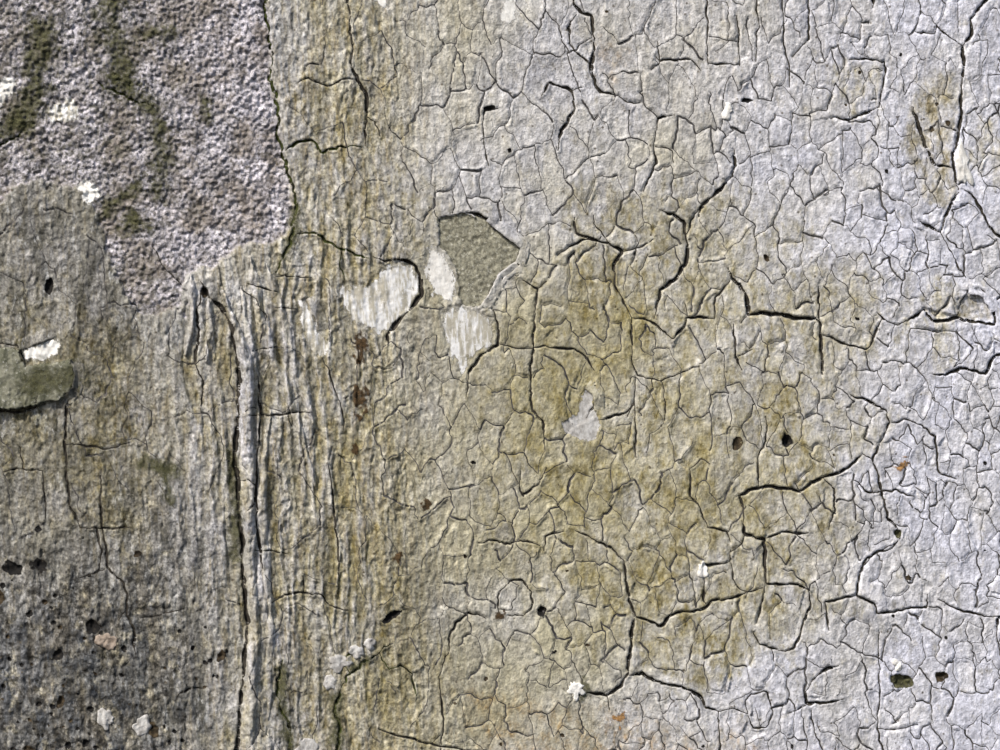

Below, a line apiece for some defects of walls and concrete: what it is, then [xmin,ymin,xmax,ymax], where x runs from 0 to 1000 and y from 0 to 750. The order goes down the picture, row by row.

peeling [0,77,16,107]
peeling [48,97,79,124]
peeling [77,178,102,205]
spalling [338,212,531,374]
peeling [562,379,605,442]
crack [168,281,398,750]